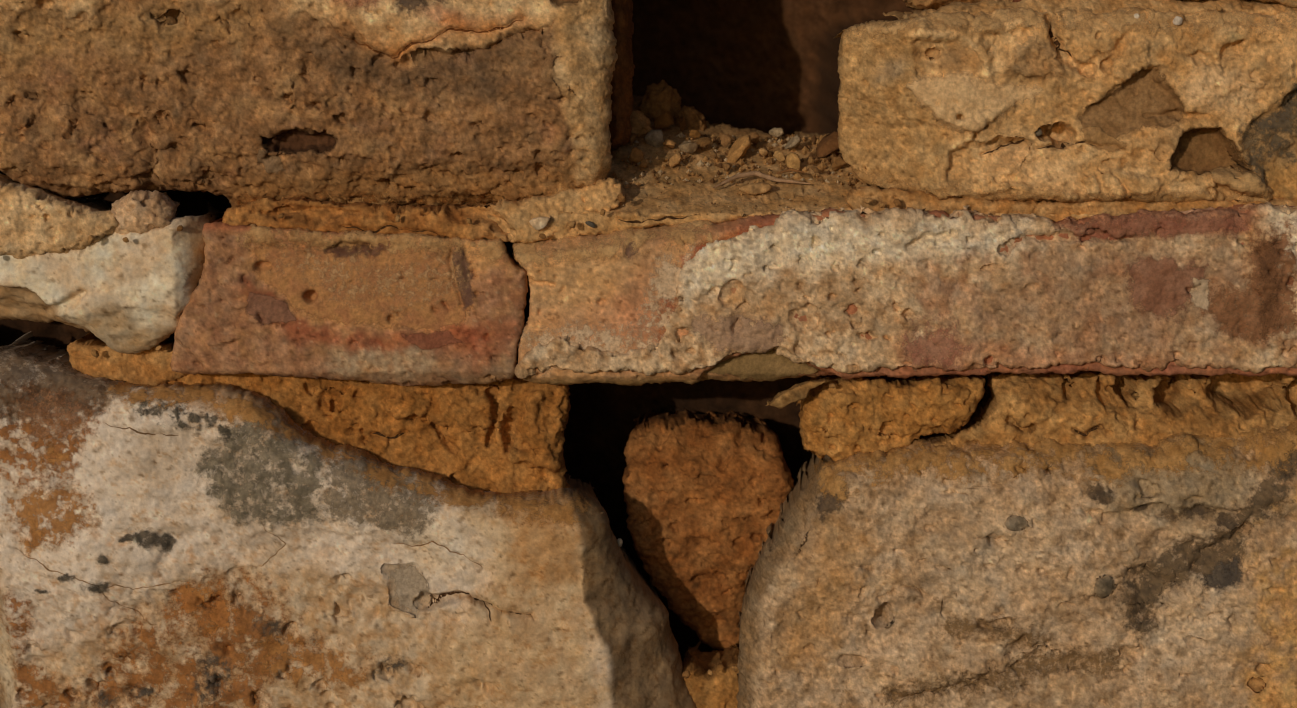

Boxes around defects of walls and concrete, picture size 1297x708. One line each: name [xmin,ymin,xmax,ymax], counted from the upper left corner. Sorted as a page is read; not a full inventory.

crack [344,20,522,59]
crack [393,541,519,621]